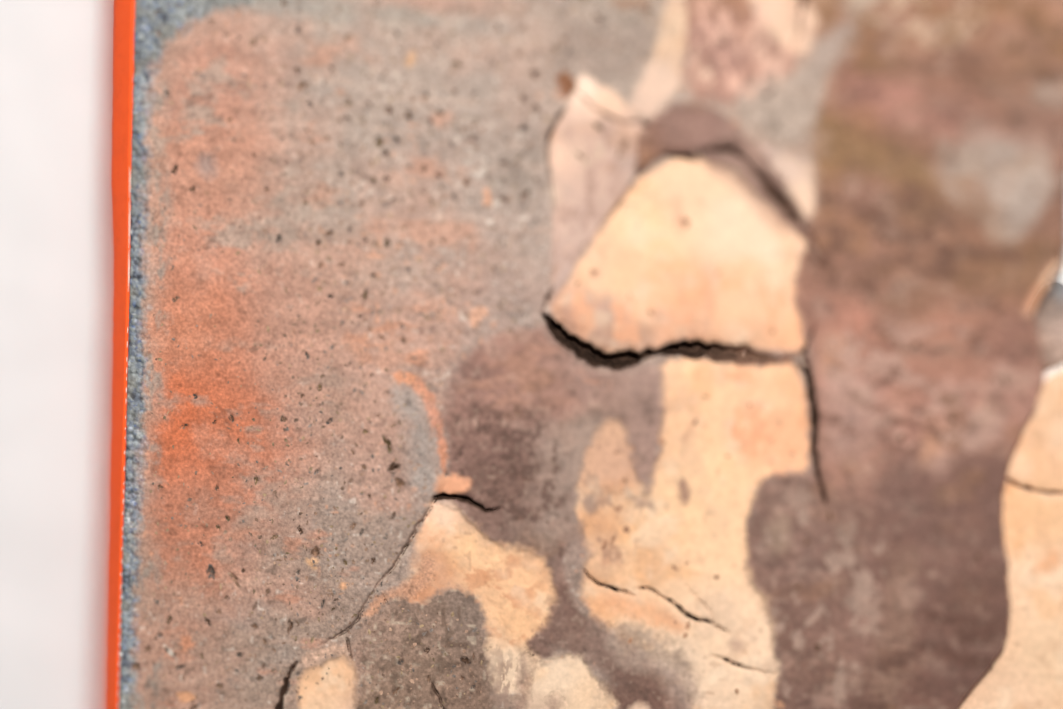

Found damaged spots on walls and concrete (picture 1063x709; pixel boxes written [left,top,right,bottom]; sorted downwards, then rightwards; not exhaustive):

leakage [540,0,658,88]
spalling [370,137,400,183]
crack [518,92,818,247]
leakage [142,52,356,530]
crack [275,662,297,709]
crack [325,493,501,656]
spalling [360,368,652,709]
leakage [349,267,709,709]
crack [585,572,726,632]
spalling [544,0,822,709]
crack [542,272,826,503]
leakage [679,0,1063,709]